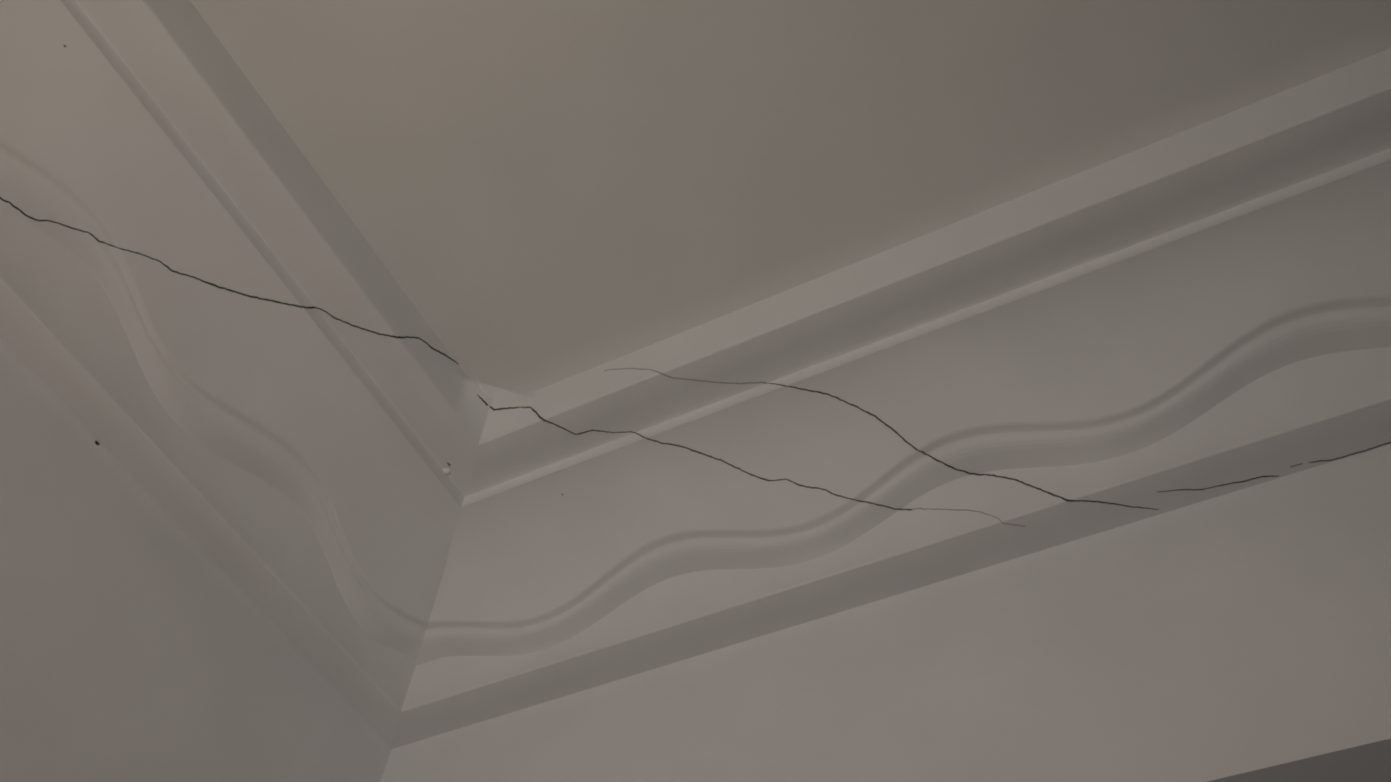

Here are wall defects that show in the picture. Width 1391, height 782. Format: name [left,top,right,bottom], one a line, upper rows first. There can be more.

crack [0,197,1021,526]
crack [605,368,1391,510]